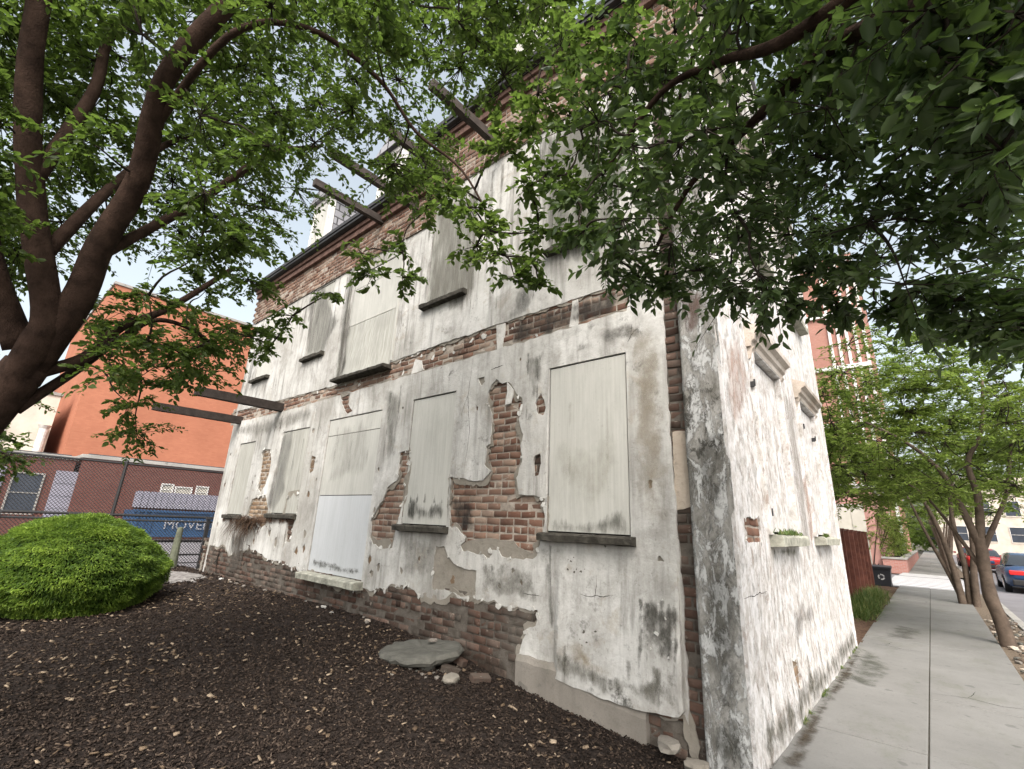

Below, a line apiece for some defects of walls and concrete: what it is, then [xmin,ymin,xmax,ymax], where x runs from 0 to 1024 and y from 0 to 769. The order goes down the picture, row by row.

flaking render [653,88,675,283]
peeling [0,285,707,769]
flaking render [744,517,762,546]
water stain [791,421,808,536]
water stain [639,600,677,656]